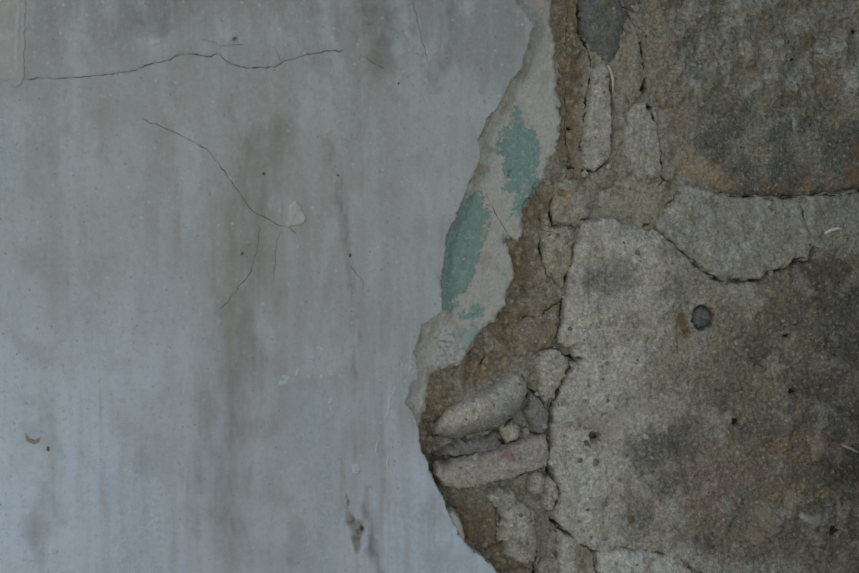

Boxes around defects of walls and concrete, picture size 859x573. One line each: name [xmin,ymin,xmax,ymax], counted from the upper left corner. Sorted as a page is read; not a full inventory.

flaking render [405,0,562,427]
crack [642,116,859,282]
flaking render [446,506,465,542]